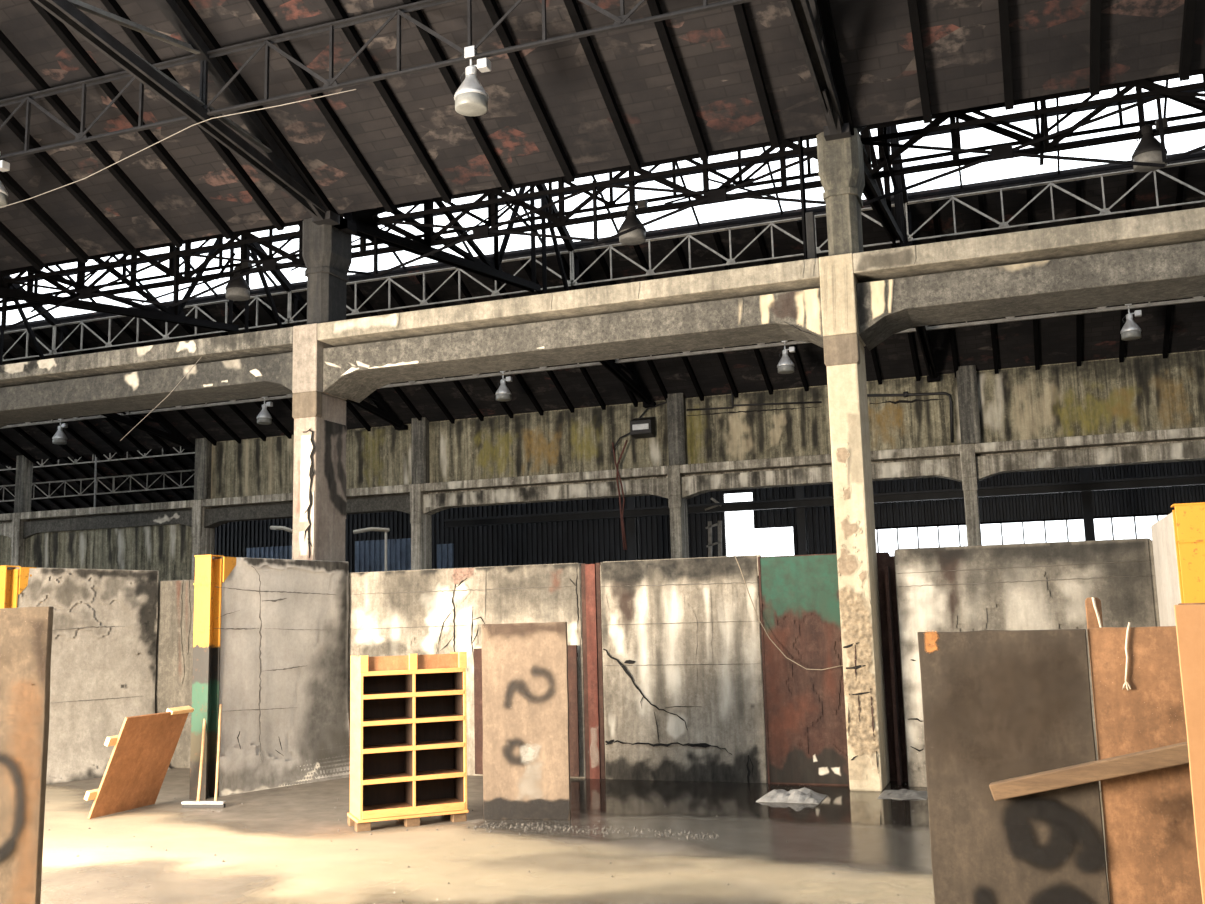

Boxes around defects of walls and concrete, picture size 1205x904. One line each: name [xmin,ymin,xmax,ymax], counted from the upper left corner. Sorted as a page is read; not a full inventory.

crack [303,428,316,558]
water stain [423,410,669,507]
water stain [682,403,824,491]
peeling [841,486,851,500]
water stain [845,386,948,491]
water stain [977,375,1205,470]
crack [214,566,334,759]
crack [437,567,485,658]
crack [603,649,754,783]
water stain [601,565,849,784]
corrosion [763,591,842,766]
spalling [760,515,881,780]